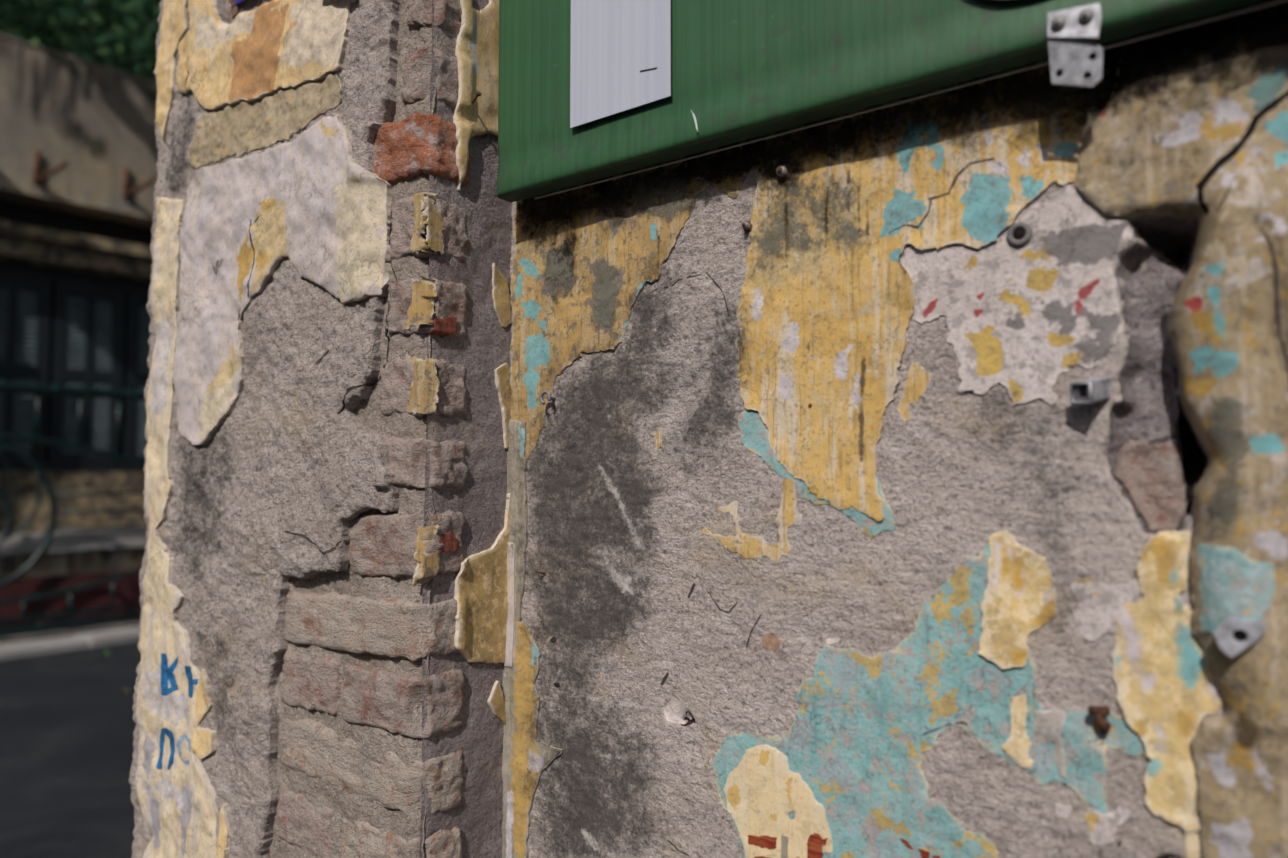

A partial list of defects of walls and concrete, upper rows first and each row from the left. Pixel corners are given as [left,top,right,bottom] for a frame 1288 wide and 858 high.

leakage [18,58,103,143]
leakage [515,0,1288,303]
crack [1196,90,1288,214]
flaking render [129,0,745,858]
leakage [512,236,677,858]
leakage [683,305,745,464]
peeling [701,59,1224,858]